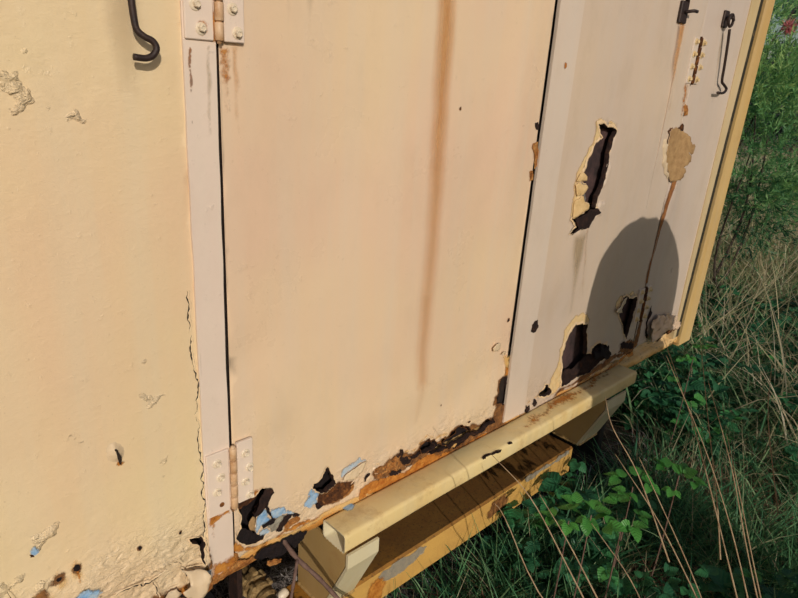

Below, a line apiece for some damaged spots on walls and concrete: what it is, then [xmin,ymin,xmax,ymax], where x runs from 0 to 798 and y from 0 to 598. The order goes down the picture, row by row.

corrosion [437,0,450,152]
spalling [572,125,612,225]
corrosion [646,181,677,284]
spalling [561,324,601,376]
corrosion [524,320,643,422]
crack [101,290,209,598]
spalling [239,488,265,533]
spalling [313,470,332,490]
corrosion [207,404,508,593]
spalling [406,427,467,452]
corrosion [35,565,81,598]
peeling [165,569,212,598]